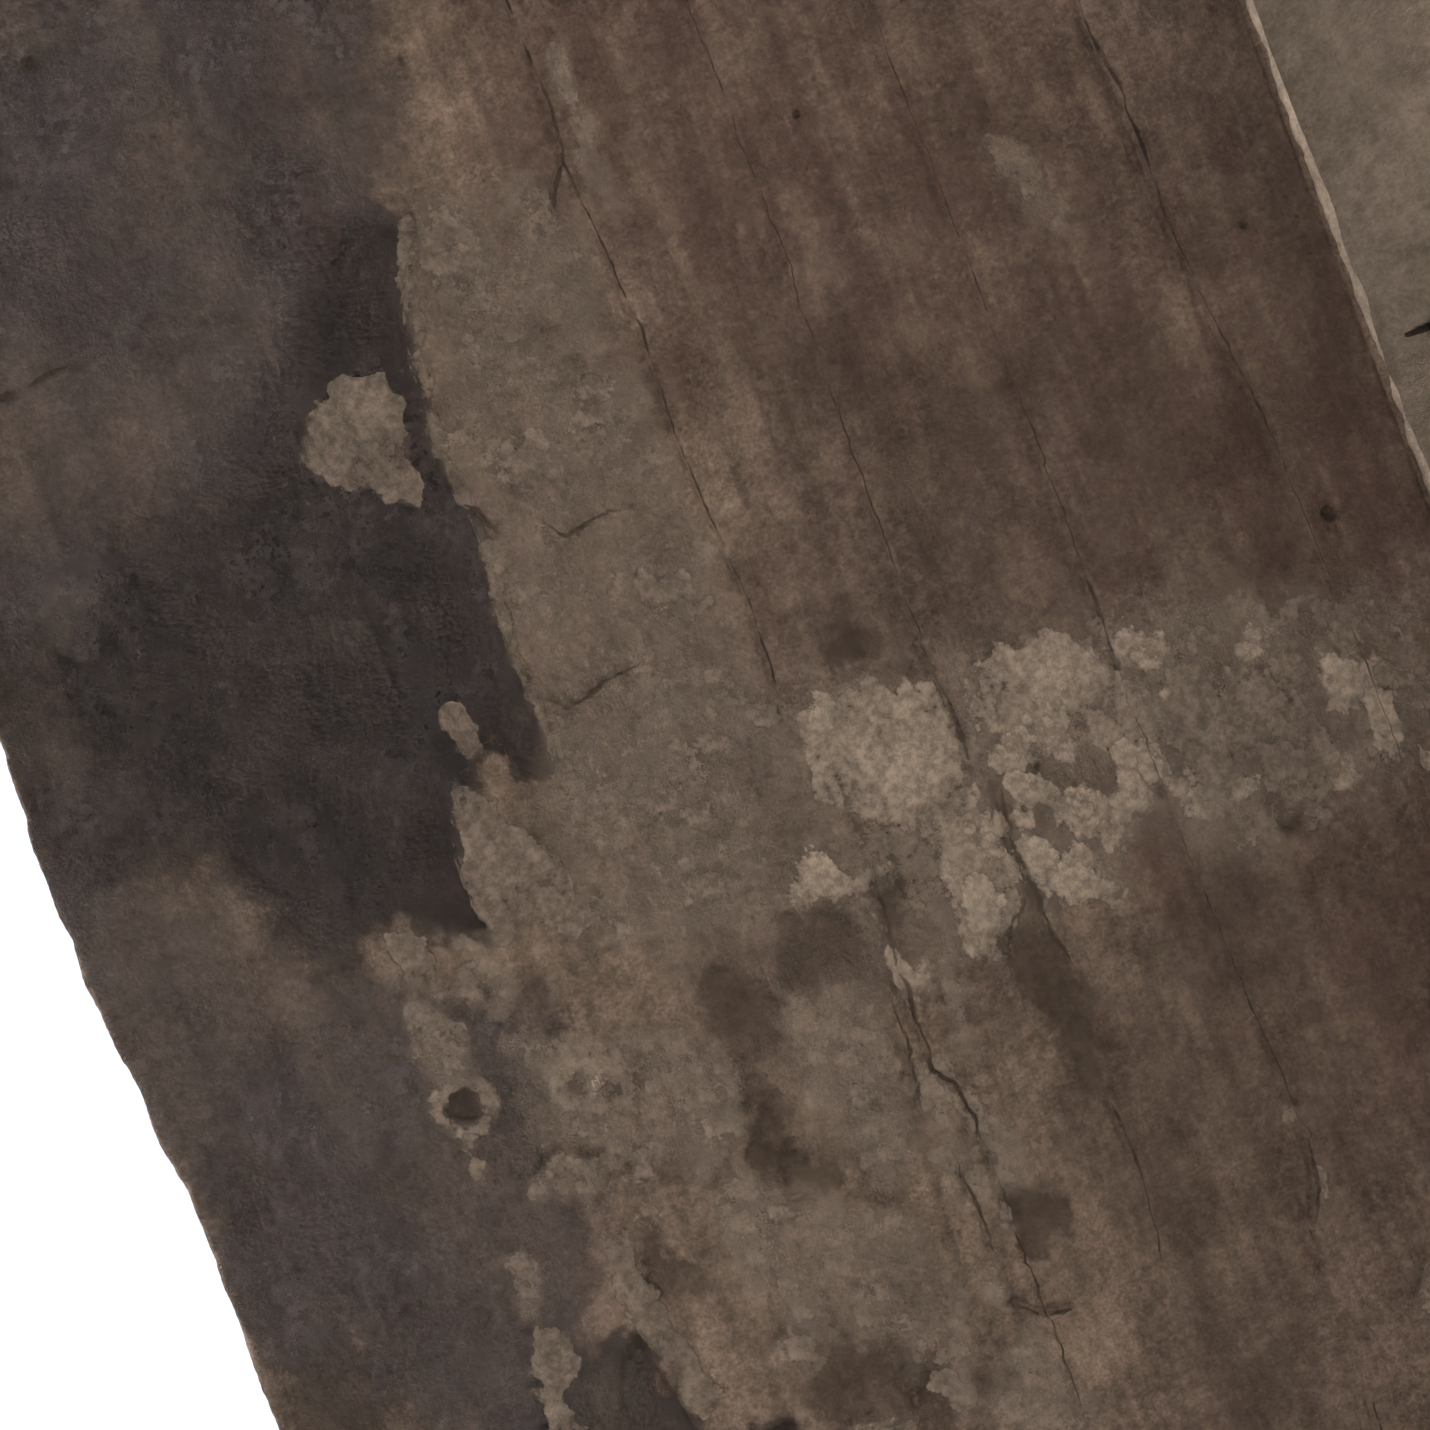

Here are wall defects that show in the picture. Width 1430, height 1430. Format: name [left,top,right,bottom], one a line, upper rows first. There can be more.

peeling [301,212,472,510]
crack [524,46,649,353]
crack [660,386,720,536]
crack [687,0,926,654]
damp [0,0,754,1430]
peeling [383,908,436,992]
spalling [478,538,546,728]
peeling [438,701,606,947]
crack [550,666,637,710]
crack [869,0,1338,1232]
crack [872,860,1081,1405]
spalling [597,1227,726,1427]